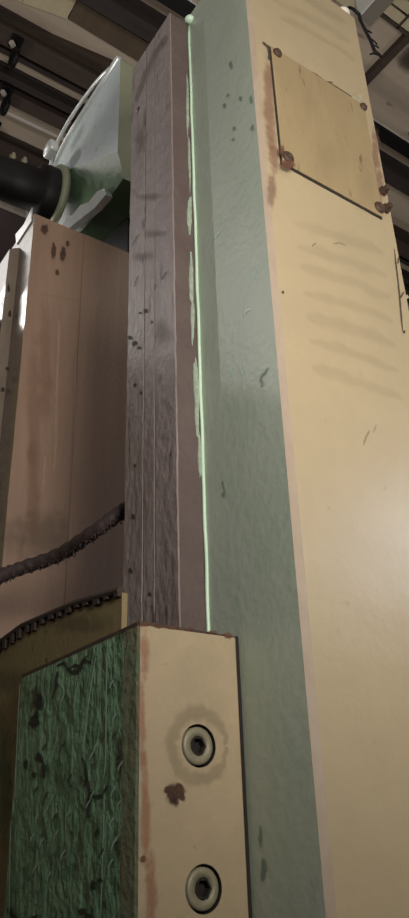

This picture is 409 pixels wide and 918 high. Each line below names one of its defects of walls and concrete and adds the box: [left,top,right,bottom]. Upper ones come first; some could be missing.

corrosion [279,145,295,170]
peeling [56,656,91,675]
peeling [29,693,43,728]
peeling [23,743,70,848]